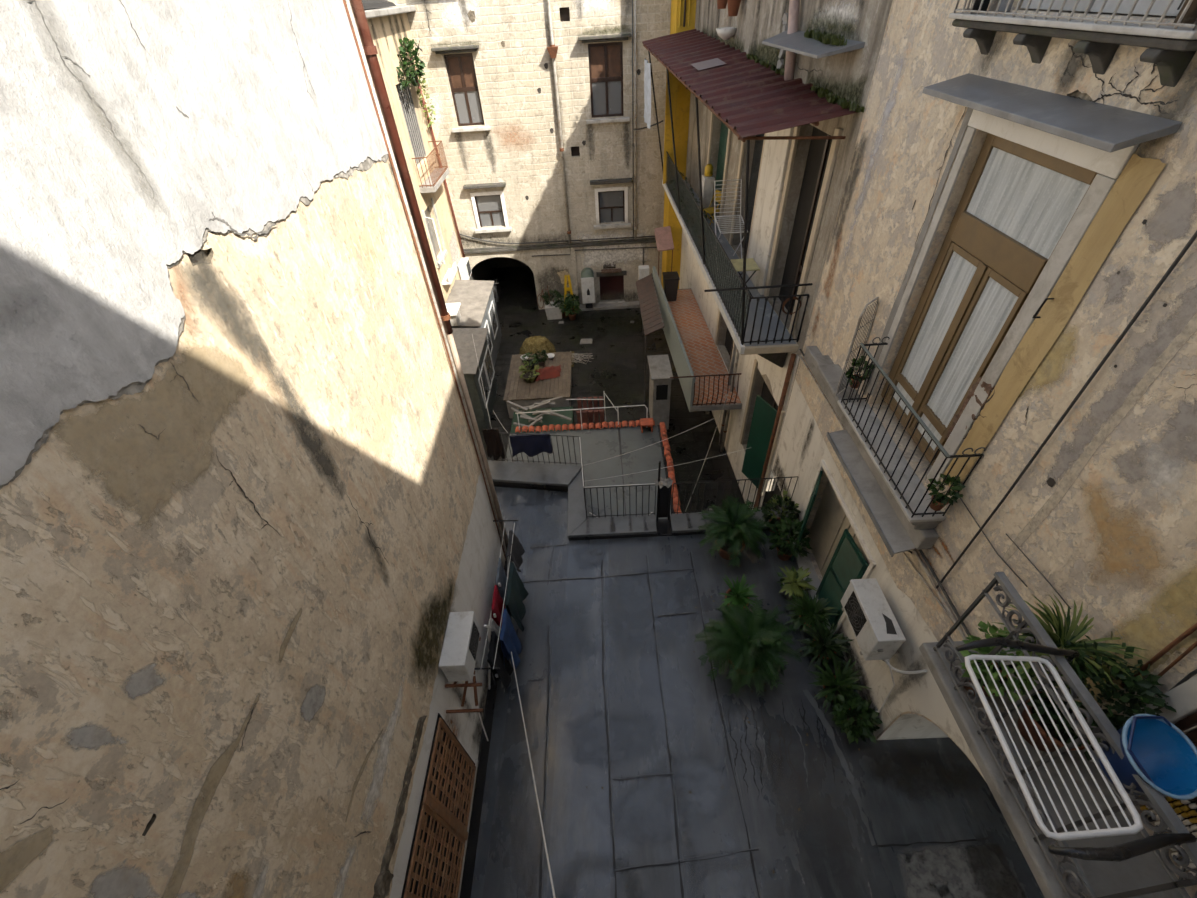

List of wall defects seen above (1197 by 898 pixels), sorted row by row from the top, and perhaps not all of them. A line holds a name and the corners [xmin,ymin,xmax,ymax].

flaking render [166,221,276,291]
spalling [320,154,389,185]
crack [1064,43,1169,115]
flaking render [0,316,252,524]
water stain [188,257,341,493]
flaking render [373,715,427,898]